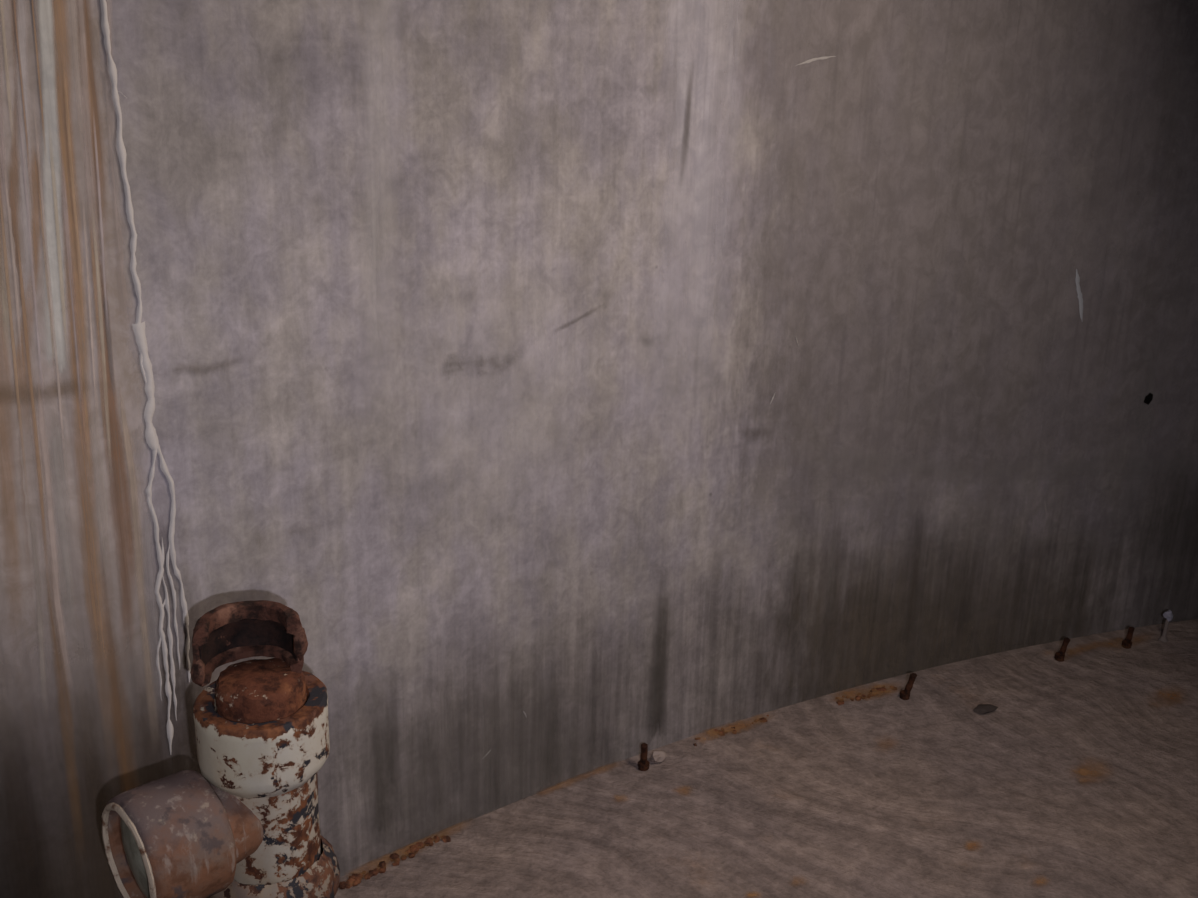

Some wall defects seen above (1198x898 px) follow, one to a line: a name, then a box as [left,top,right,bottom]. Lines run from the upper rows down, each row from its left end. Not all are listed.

rust [0,0,146,649]
crack [100,0,191,754]
damp [789,576,1084,702]